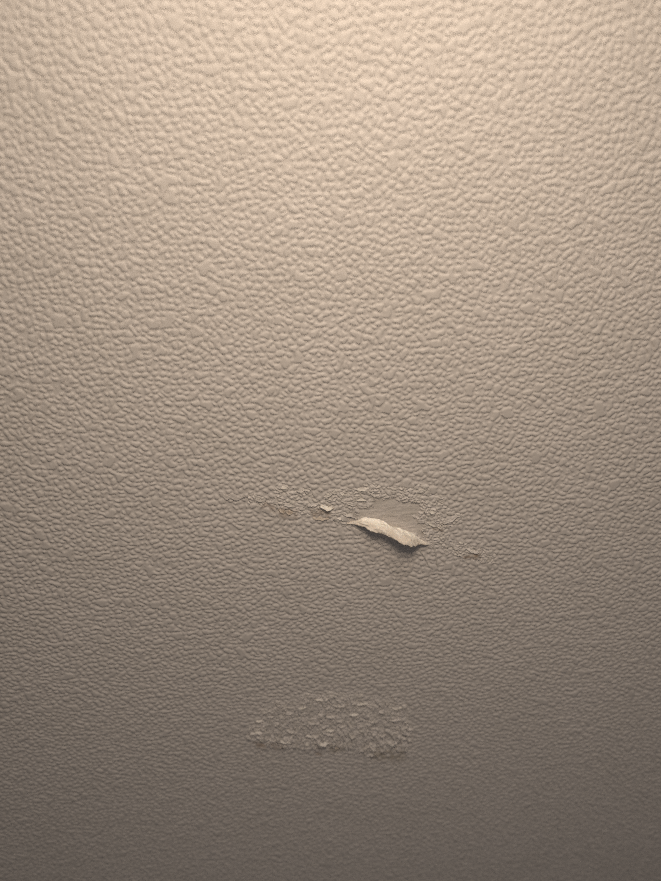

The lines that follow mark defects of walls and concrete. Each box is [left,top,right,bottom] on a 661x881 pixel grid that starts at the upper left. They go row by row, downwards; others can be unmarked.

peeling [307,487,430,548]